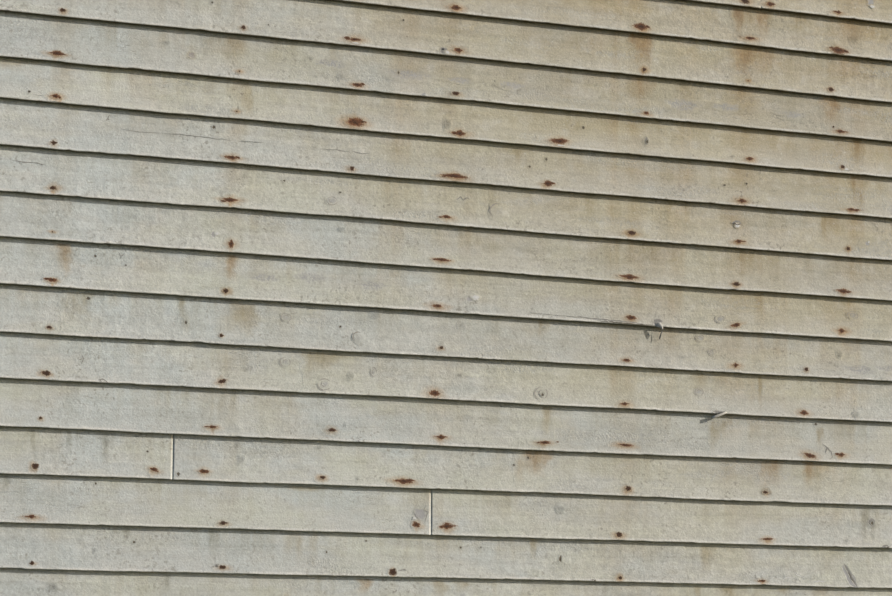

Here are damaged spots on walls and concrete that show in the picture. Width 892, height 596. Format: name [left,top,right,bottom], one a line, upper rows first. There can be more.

rust [727,0,785,84]
rust [37,48,75,61]
rust [822,43,856,56]
rust [625,21,659,118]
rust [332,111,377,130]
rust [541,134,577,148]
rust [430,169,477,183]
rust [210,193,251,207]
rust [610,273,650,283]
rust [755,447,853,499]
rust [379,475,426,488]
rust [408,518,462,535]